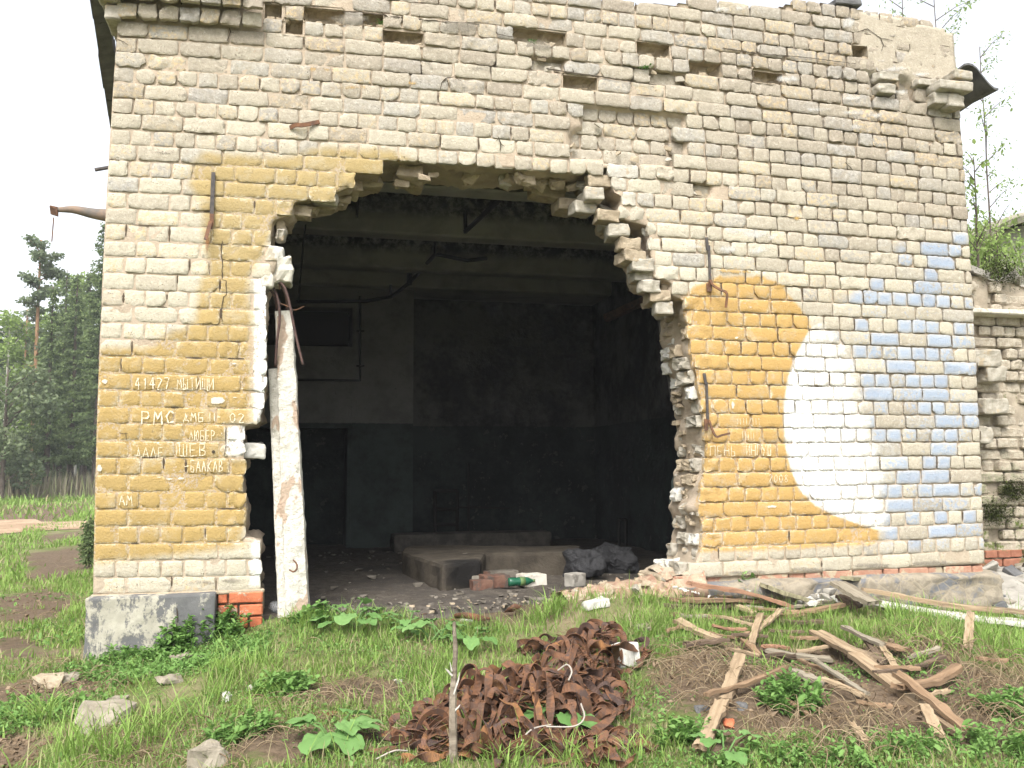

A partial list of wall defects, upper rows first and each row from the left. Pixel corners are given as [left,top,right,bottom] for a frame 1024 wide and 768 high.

spalling [263,2,345,37]
spalling [362,10,424,48]
spalling [421,61,453,78]
spalling [512,26,597,93]
spalling [632,39,723,86]
spalling [752,67,788,86]
spalling [851,43,875,101]
spalling [889,77,909,101]
spalling [274,164,439,244]
spalling [498,109,709,574]